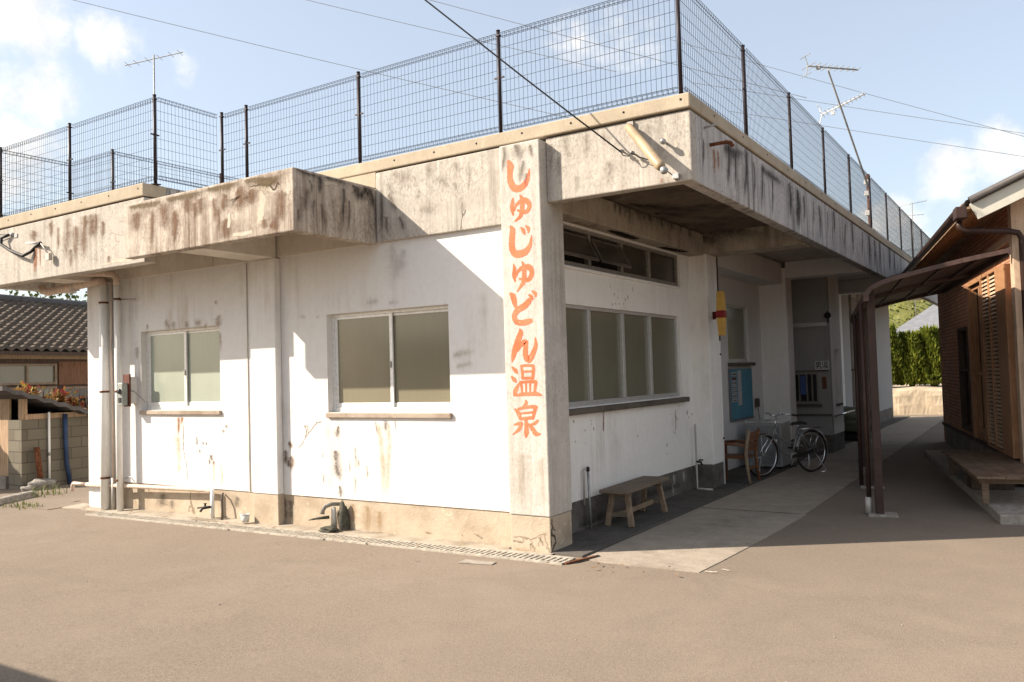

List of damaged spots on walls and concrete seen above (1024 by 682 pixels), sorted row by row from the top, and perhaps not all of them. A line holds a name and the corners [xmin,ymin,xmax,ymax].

damp [130,176,284,239]
damp [297,169,403,229]
damp [724,146,895,269]
damp [49,214,104,264]
crack [516,520,557,551]